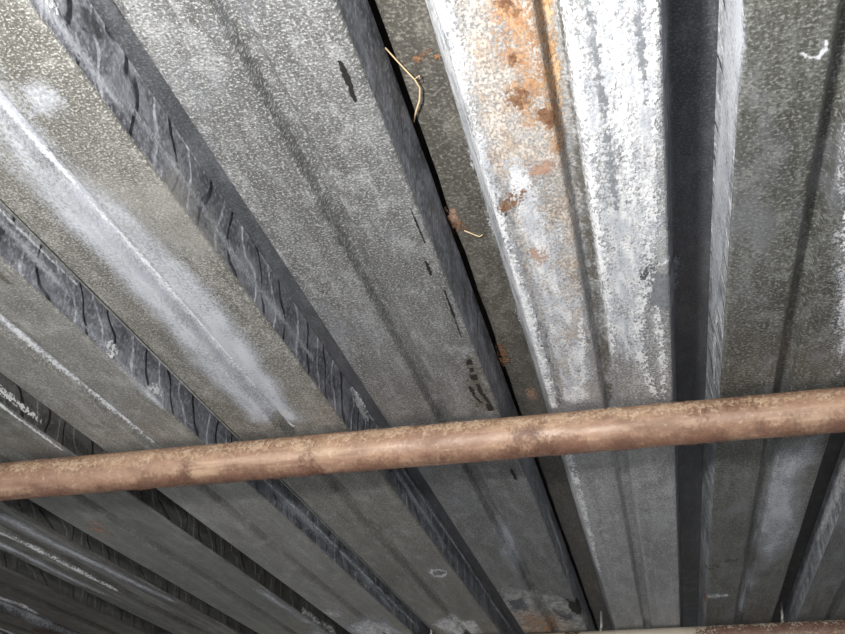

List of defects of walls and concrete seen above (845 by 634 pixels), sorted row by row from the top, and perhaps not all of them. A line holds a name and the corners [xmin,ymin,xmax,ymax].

damp [801,40,828,60]
corrosion [454,0,595,401]
damp [426,0,682,409]
damp [831,130,845,374]
damp [789,459,845,615]